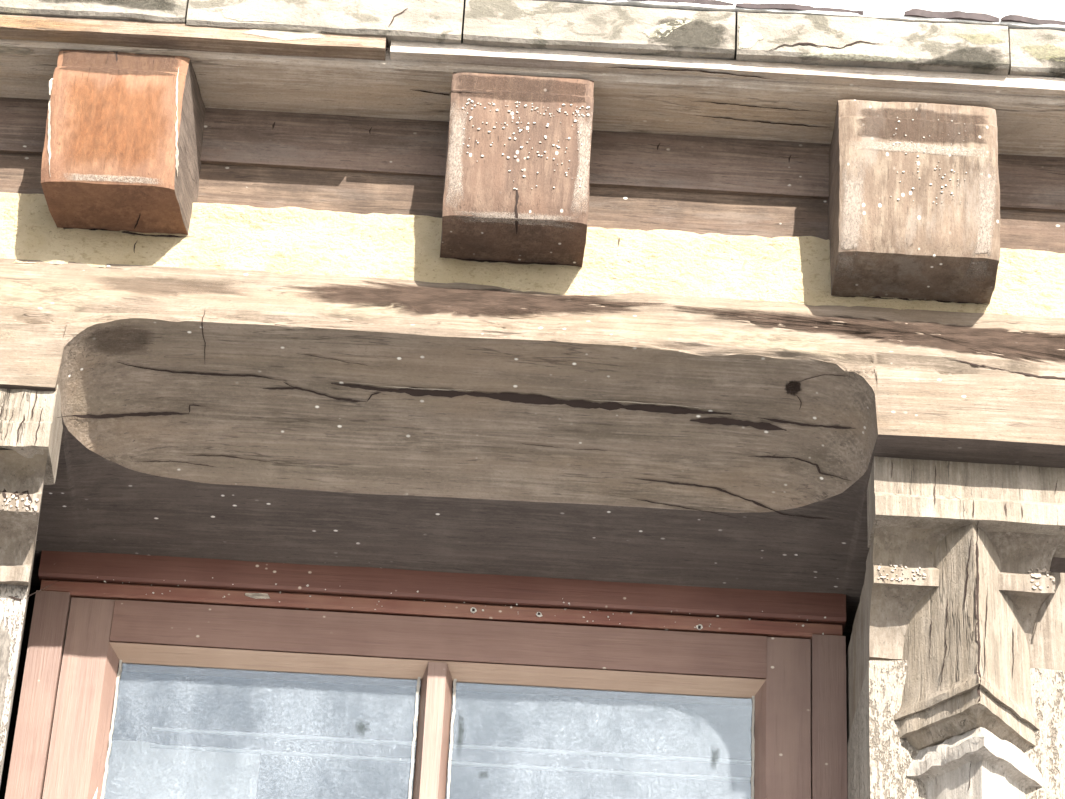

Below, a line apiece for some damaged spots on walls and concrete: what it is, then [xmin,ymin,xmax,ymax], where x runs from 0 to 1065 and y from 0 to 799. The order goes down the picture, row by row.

damp [655,19,724,49]
damp [922,47,997,69]
damp [1047,56,1065,77]
damp [297,281,662,317]
damp [678,306,1065,362]
crack [118,312,856,431]
crack [0,392,200,445]
crack [139,455,277,467]
crack [753,456,851,481]
crack [3,489,33,510]
crack [630,478,825,519]
crack [929,500,988,702]